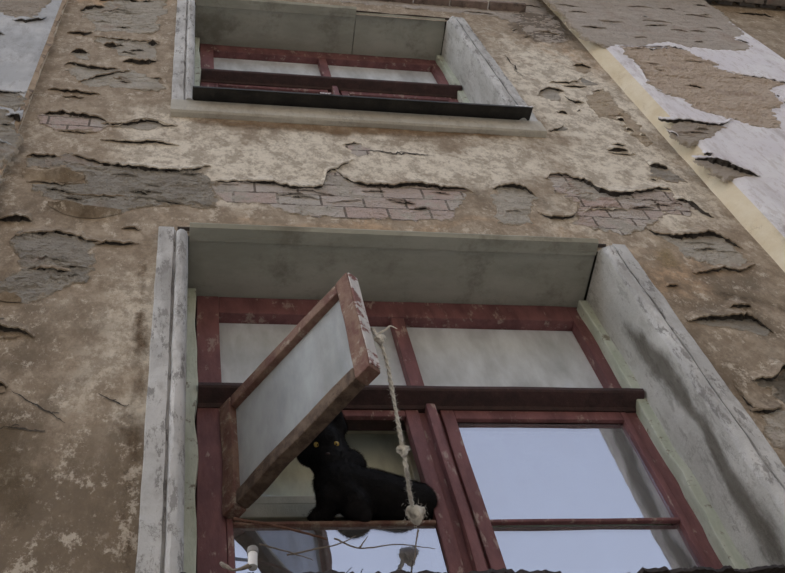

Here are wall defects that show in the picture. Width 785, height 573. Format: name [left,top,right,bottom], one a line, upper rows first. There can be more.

spalling [0,0,52,23]
spalling [48,0,168,99]
spalling [309,0,785,183]
spalling [0,89,474,223]
flaking render [0,318,35,339]
spalling [0,208,141,304]
spalling [489,159,756,274]
flaking render [724,297,751,308]
spalling [731,357,785,451]